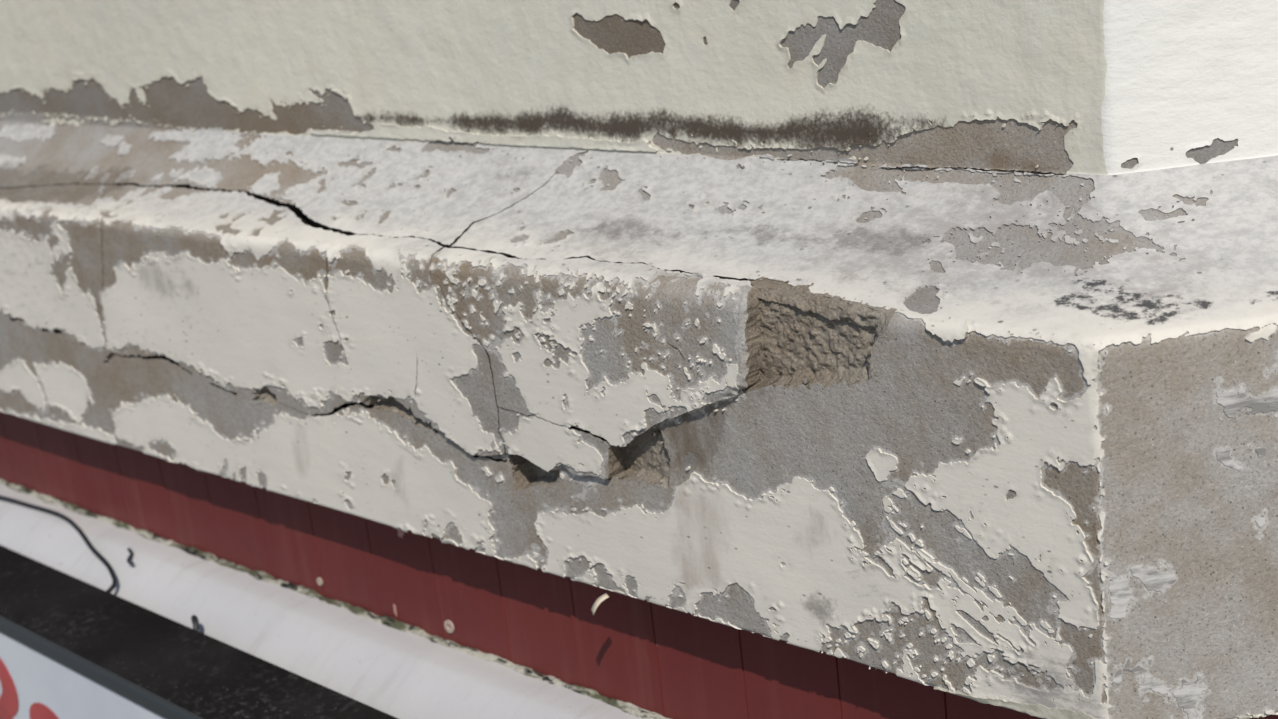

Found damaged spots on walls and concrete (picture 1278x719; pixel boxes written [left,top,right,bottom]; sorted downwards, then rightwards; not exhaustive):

peeling [573,13,665,58]
peeling [781,0,906,88]
peeling [0,76,399,343]
peeling [422,140,490,158]
peeling [555,152,587,178]
peeling [589,167,624,191]
leakage [356,108,943,149]
peeling [650,117,1212,276]
peeling [1185,138,1238,164]
peeling [510,228,574,245]
crack [430,169,566,454]
peeling [0,252,1278,719]